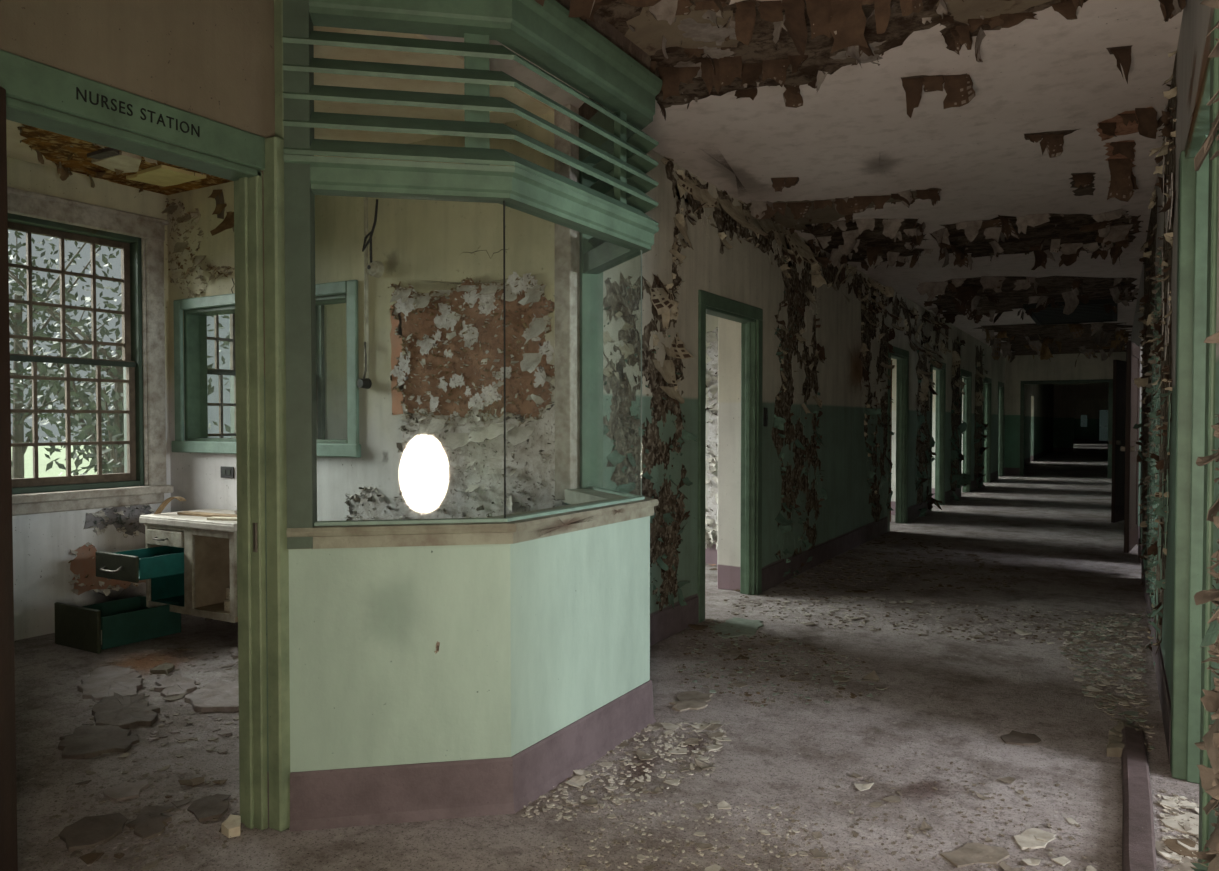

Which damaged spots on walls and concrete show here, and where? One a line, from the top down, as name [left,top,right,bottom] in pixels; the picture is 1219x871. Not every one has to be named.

peeling [568,0,1088,121]
peeling [1106,45,1133,84]
peeling [1158,0,1219,57]
peeling [17,124,235,299]
peeling [344,272,566,520]
peeling [603,51,1177,666]
peeling [68,504,155,596]
peeling [1190,414,1219,871]